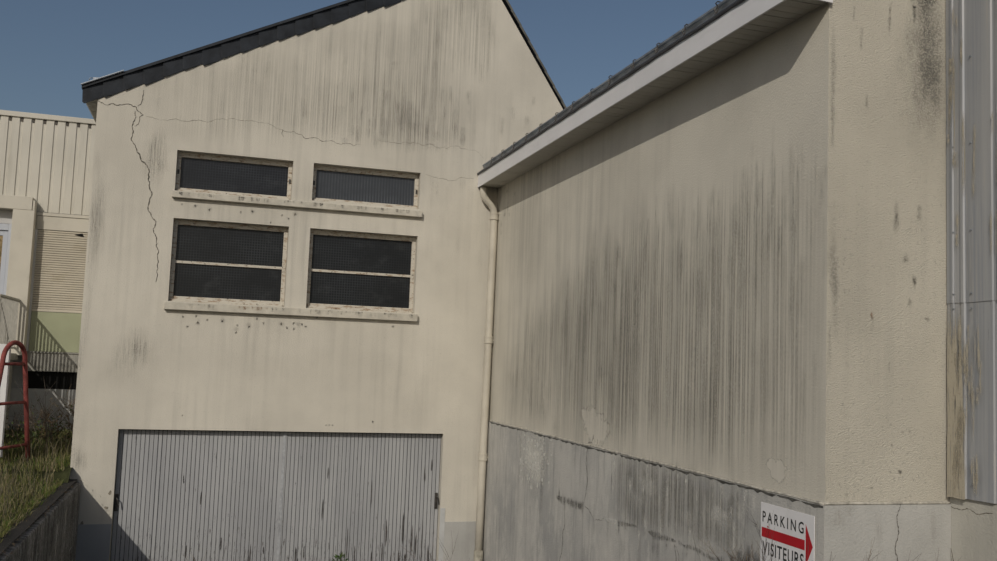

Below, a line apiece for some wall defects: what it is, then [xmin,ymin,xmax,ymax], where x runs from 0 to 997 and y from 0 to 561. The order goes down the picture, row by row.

crack [99,90,360,280]
peeling [947,320,981,500]